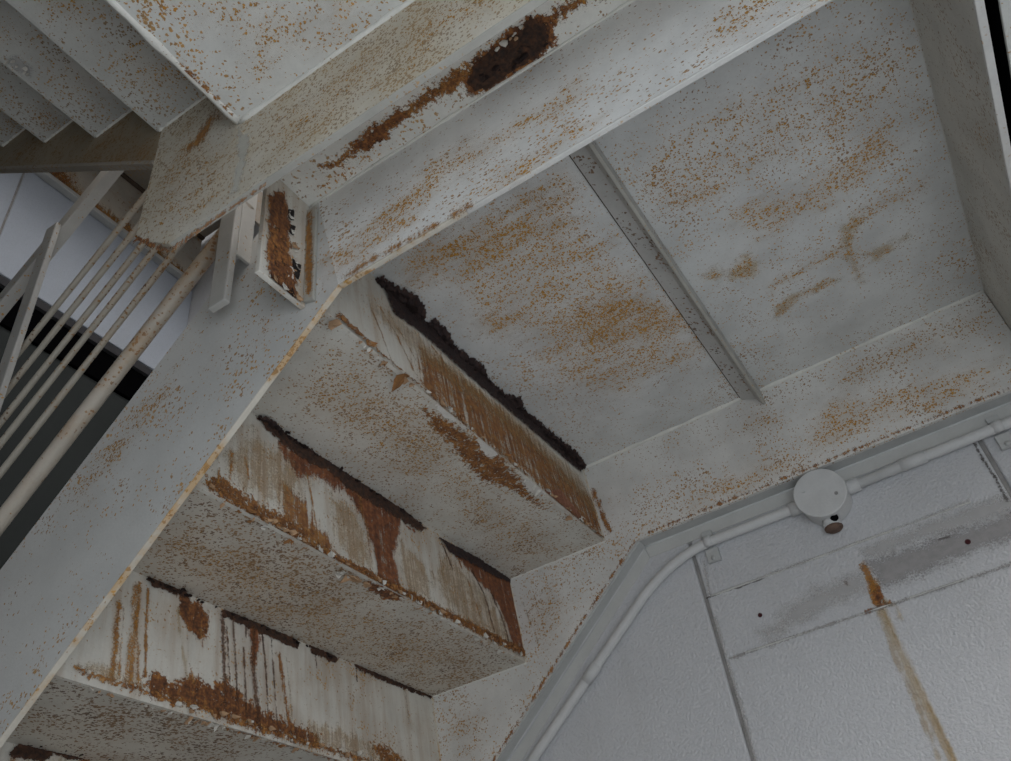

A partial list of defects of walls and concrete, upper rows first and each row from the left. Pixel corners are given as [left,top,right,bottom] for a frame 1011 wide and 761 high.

rust [314,0,596,192]
rust [700,0,815,46]
rust [636,33,926,241]
rust [302,72,706,554]
rust [769,180,927,316]
rust [648,319,1000,533]
rust [108,415,460,748]
rust [439,537,635,702]
rust [859,563,892,614]
rust [9,744,90,761]
rust [370,739,405,761]